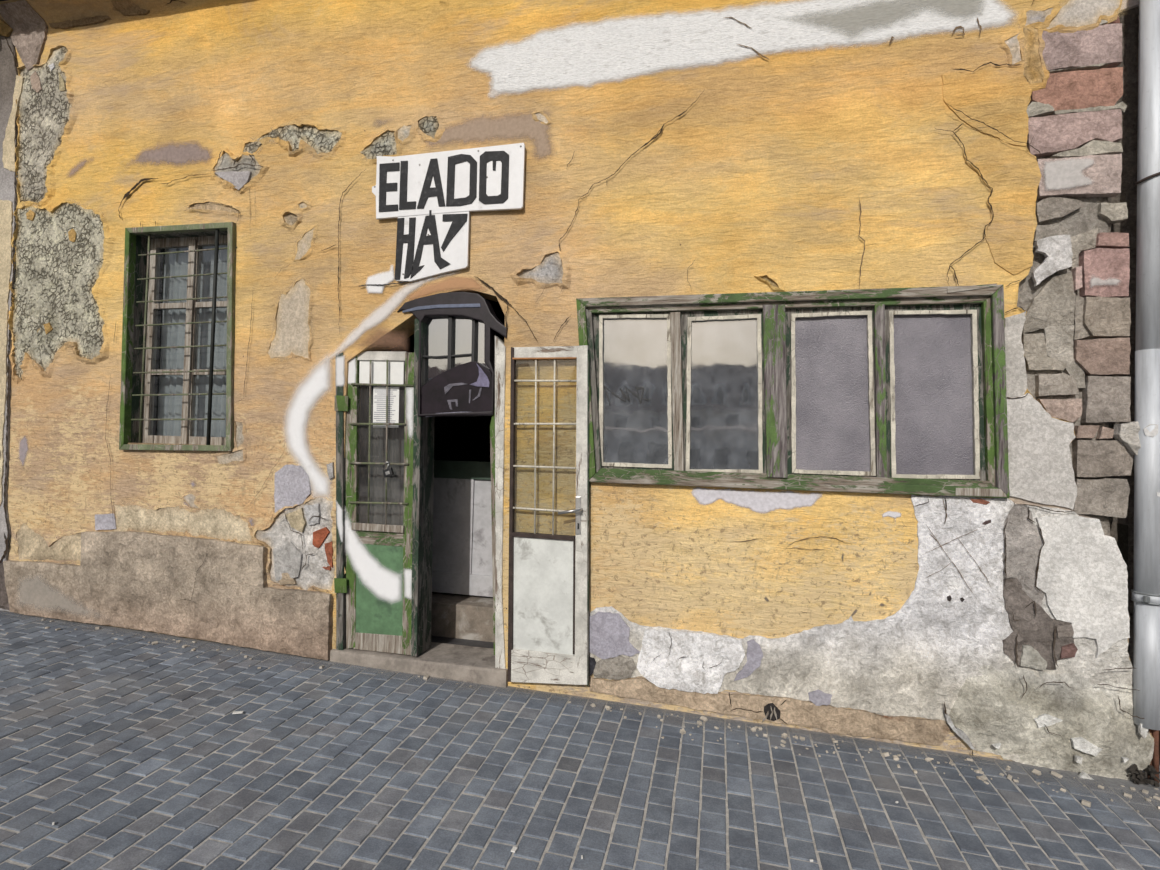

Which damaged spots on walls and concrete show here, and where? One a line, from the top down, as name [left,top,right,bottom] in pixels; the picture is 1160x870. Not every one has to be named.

crack [954,62,1022,72]
spalling [0,0,150,506]
peeling [279,198,319,262]
spalling [183,108,448,218]
crack [474,92,703,340]
crack [935,104,1041,285]
peeling [266,275,315,362]
peeling [212,420,250,467]
flaking render [718,0,1160,781]
spalling [0,562,10,611]
spalling [111,492,346,599]
spalling [590,606,708,680]